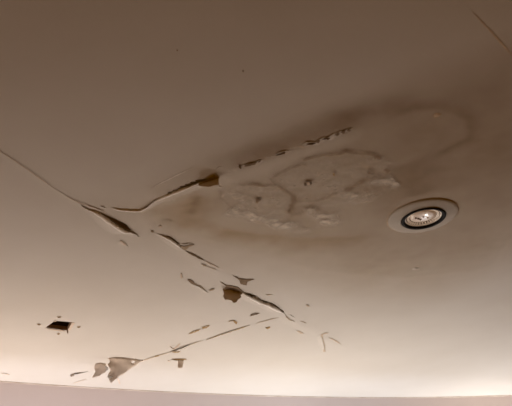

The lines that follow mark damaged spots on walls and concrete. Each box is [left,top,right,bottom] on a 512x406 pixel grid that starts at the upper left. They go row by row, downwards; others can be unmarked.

crack [0,150,224,237]
crack [151,226,218,270]
peeling [221,276,254,303]
crack [143,293,305,361]
peeling [70,357,143,384]